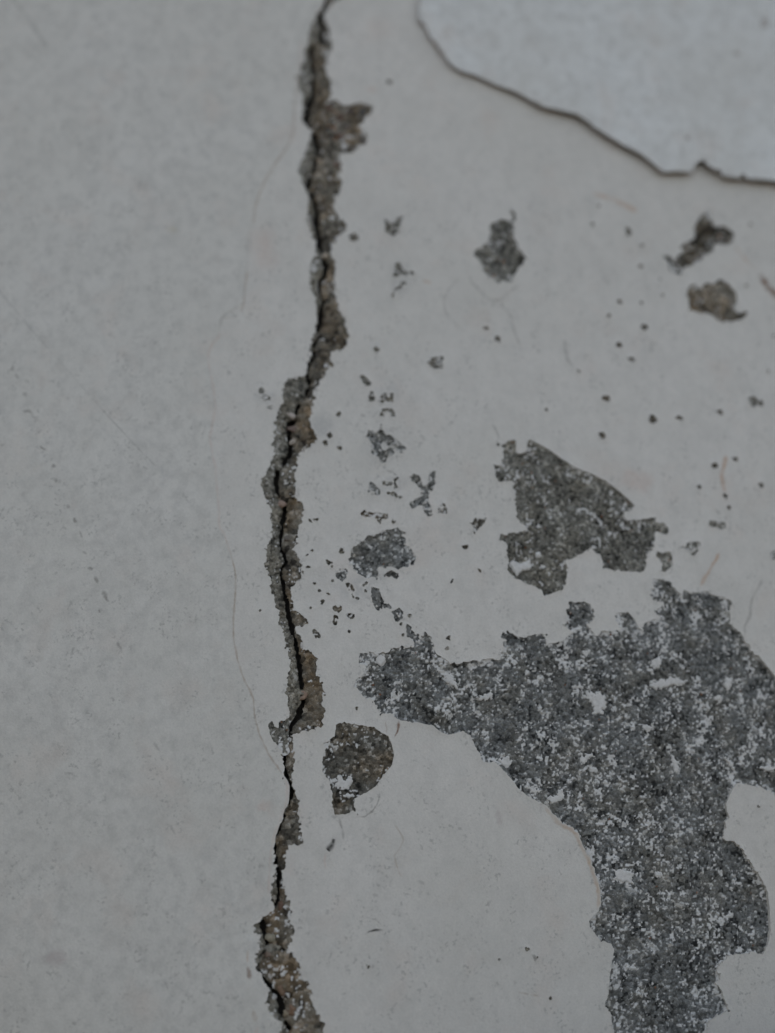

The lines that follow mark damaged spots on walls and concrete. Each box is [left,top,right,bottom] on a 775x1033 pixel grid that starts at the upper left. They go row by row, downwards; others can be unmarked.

peeling [418,0,775,182]
spalling [474,209,527,284]
spalling [664,209,734,275]
spalling [687,280,747,323]
peeling [360,376,406,463]
crack [207,0,374,1033]
peeling [332,605,355,625]
spalling [322,722,394,815]
spalling [336,440,775,1033]